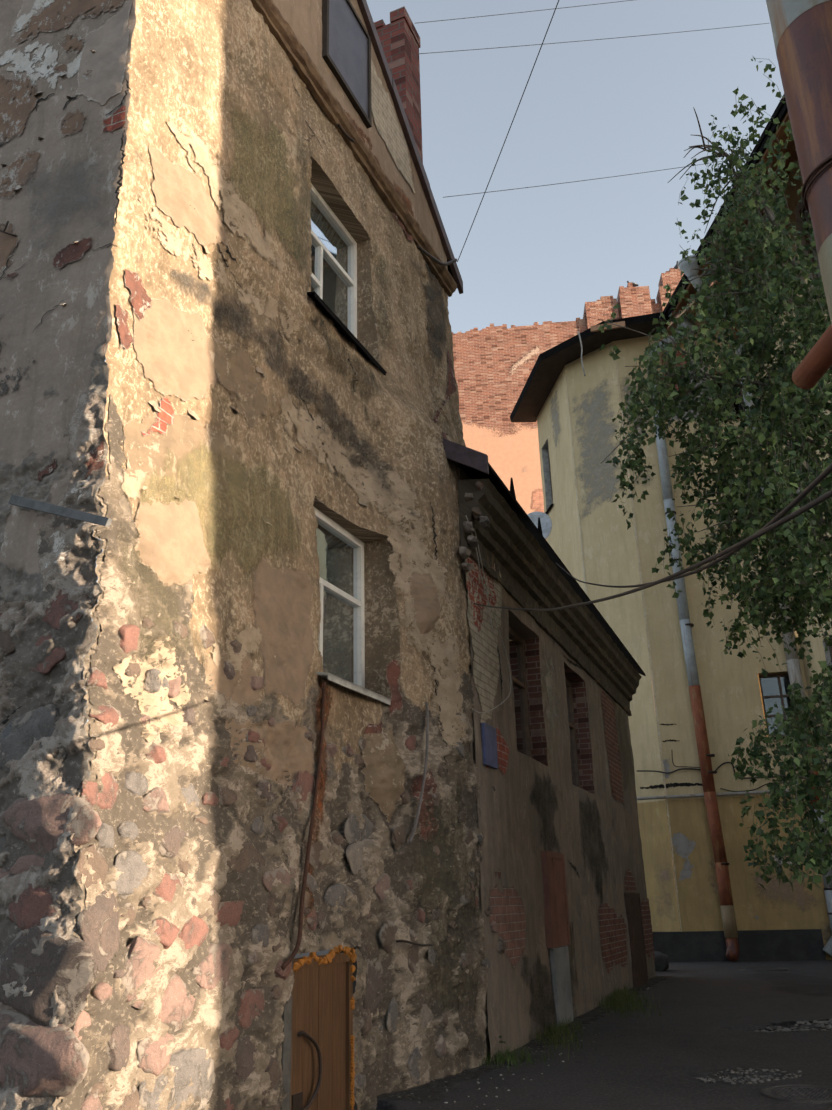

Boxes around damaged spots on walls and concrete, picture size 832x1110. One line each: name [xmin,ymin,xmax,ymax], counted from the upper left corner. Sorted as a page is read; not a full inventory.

peeling [0,0,132,142]
peeling [0,137,42,199]
spalling [52,237,93,270]
peeling [661,350,712,421]
peeling [574,383,647,517]
spalling [530,489,544,513]
flaking render [0,269,527,1110]